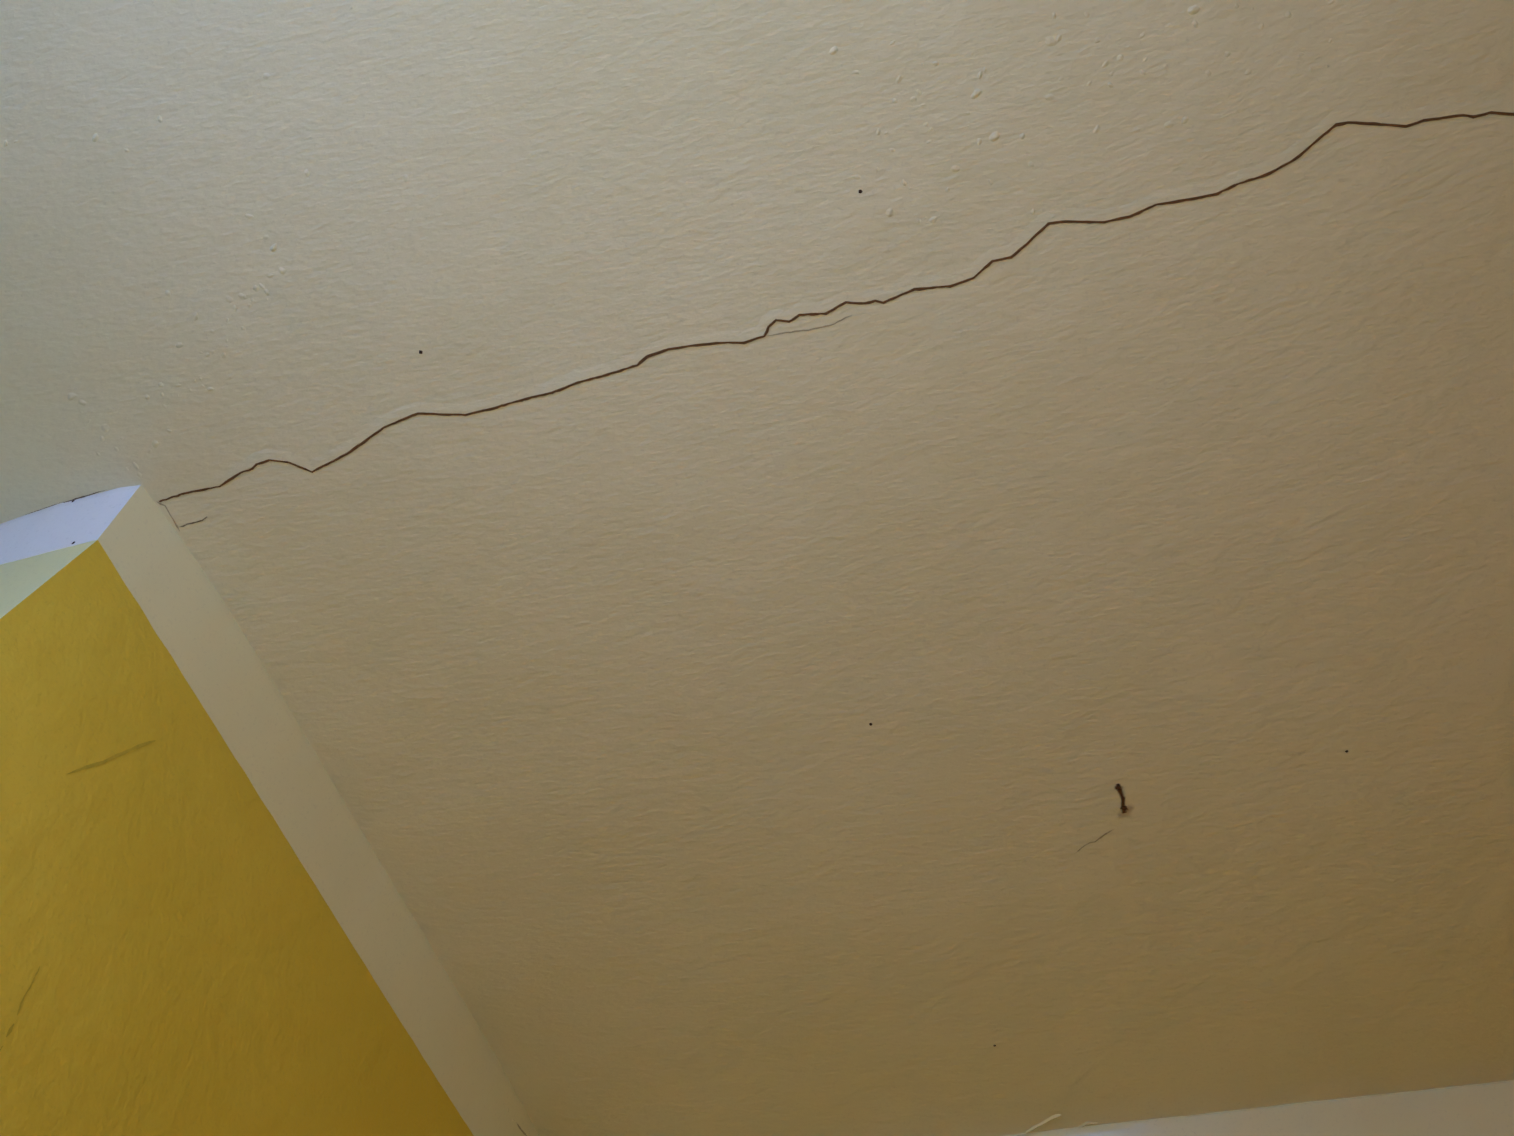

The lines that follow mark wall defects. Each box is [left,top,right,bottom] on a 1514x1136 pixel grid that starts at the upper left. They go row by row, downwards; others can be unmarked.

crack [155,99,1514,527]